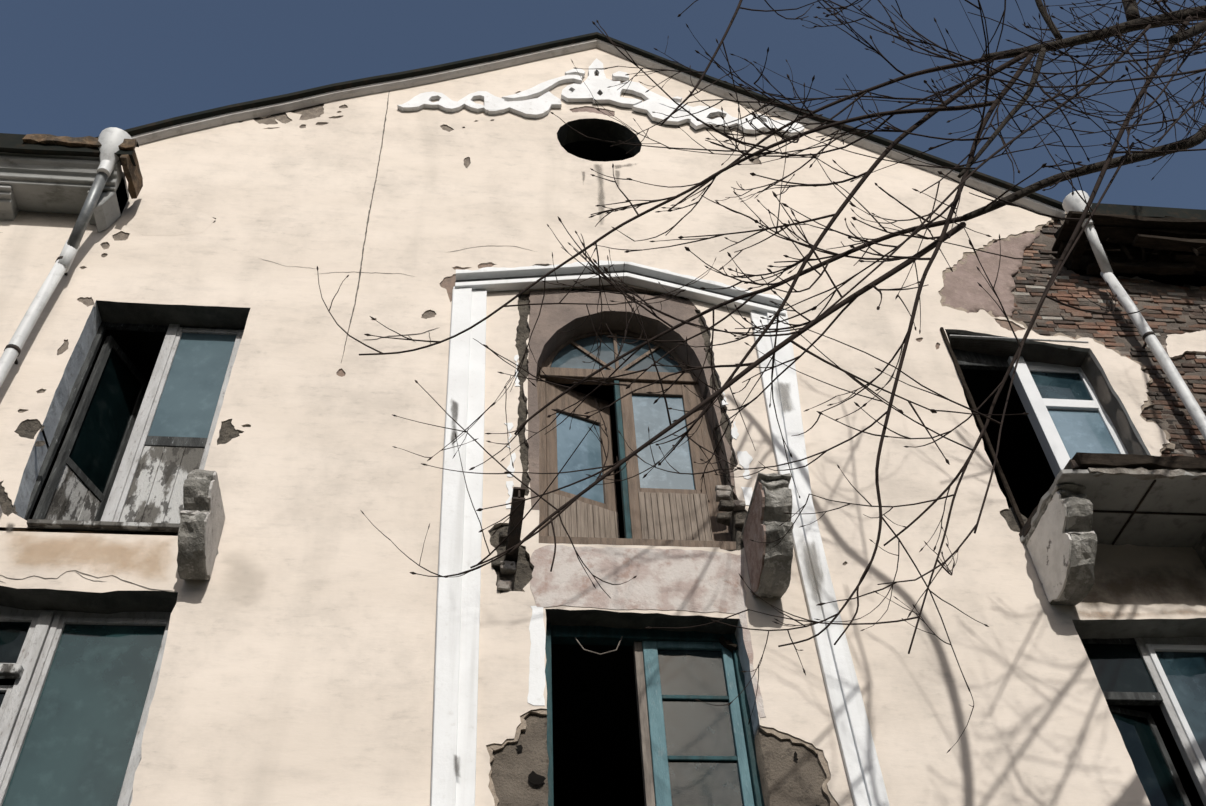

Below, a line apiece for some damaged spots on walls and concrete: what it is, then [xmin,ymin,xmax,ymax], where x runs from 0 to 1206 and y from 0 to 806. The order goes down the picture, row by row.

flaking render [238,104,348,128]
flaking render [101,232,130,258]
crack [262,91,437,362]
flaking render [916,211,1206,458]
flaking render [15,410,45,447]
flaking render [217,420,251,445]
flaking render [504,423,516,509]
flaking render [1000,507,1027,532]
crack [1,570,171,591]
spalling [489,525,533,594]
flaking render [486,606,549,806]
flaking render [739,614,838,806]